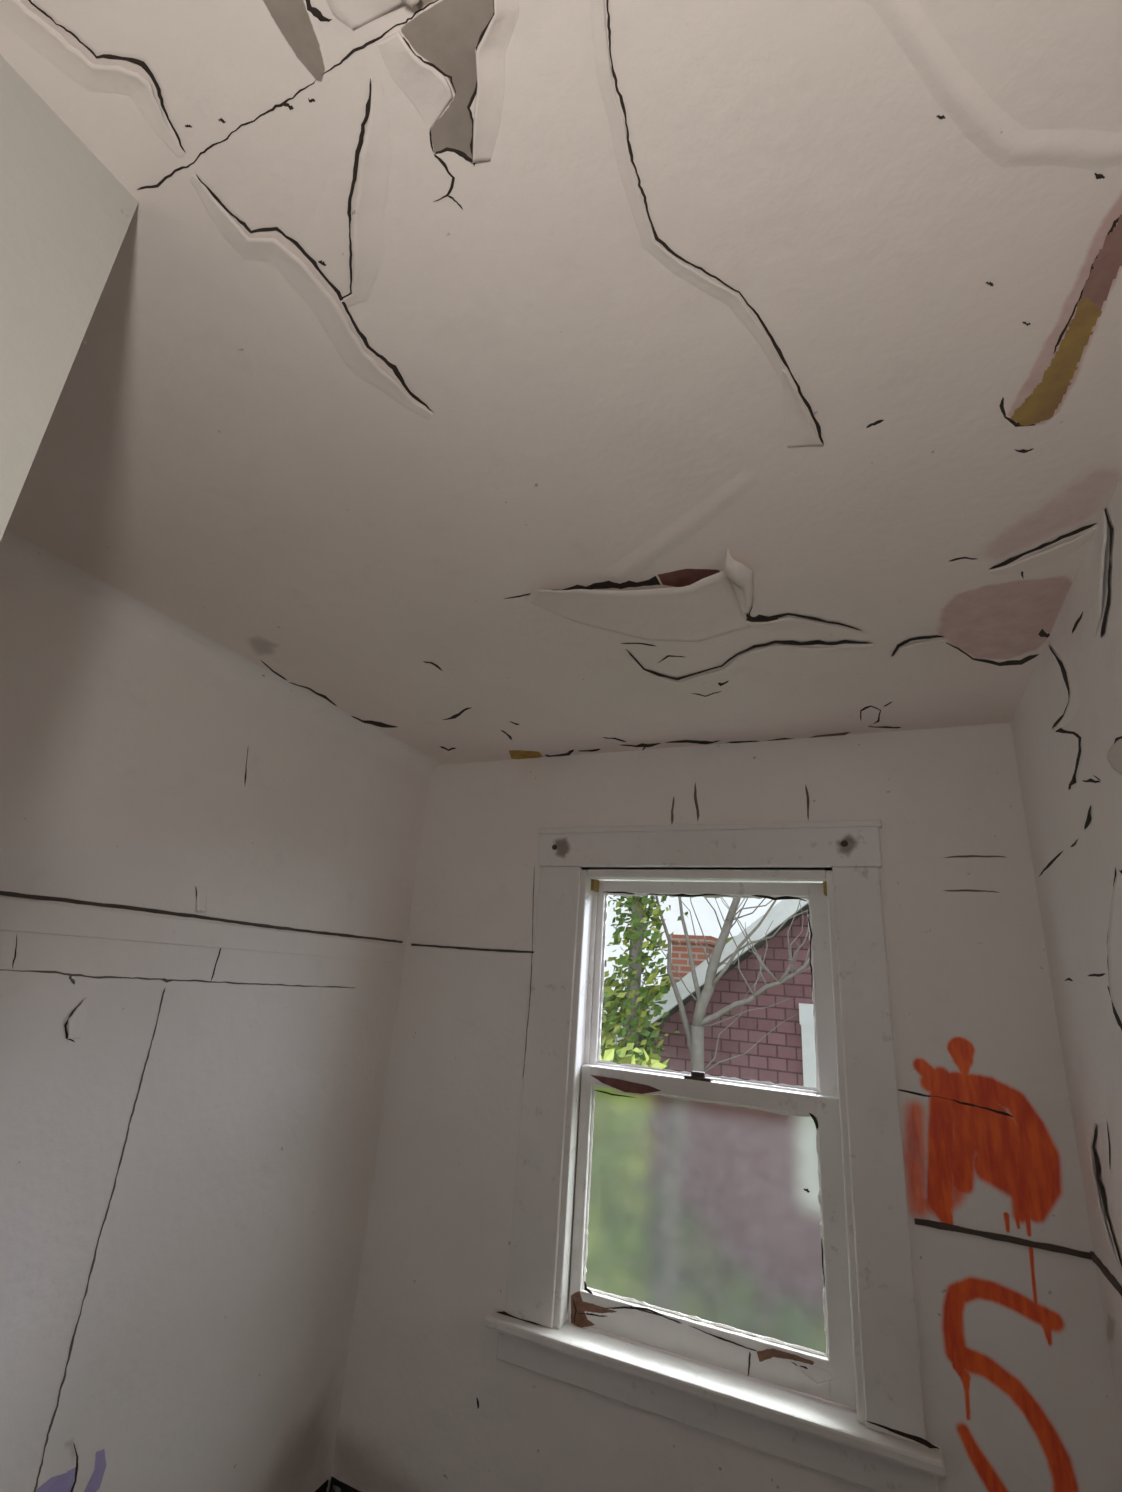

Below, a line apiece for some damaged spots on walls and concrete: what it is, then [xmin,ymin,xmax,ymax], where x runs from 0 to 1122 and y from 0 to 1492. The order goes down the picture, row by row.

peeling [257,0,519,168]
crack [0,0,438,420]
crack [433,155,463,210]
crack [590,0,824,447]
flaking render [999,173,1122,432]
crack [262,661,397,728]
peeling [505,549,777,642]
crack [620,613,946,697]
peeling [931,456,1122,666]
crack [948,508,1113,876]
crack [1087,1123,1122,1274]
peeling [570,1290,618,1329]